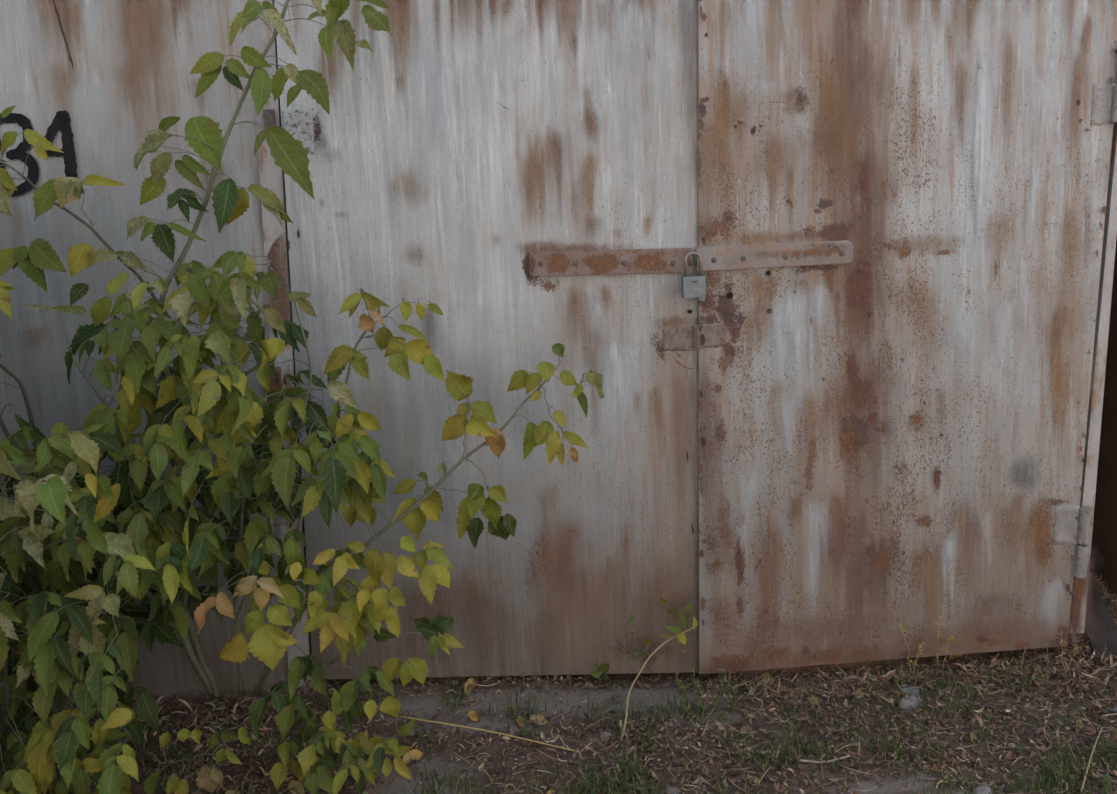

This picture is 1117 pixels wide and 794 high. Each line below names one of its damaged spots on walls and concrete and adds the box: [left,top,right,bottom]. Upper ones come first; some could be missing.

corrosion [1069,0,1103,51]
corrosion [582,156,597,232]
corrosion [522,232,669,293]
corrosion [697,210,739,242]
corrosion [748,198,873,314]
corrosion [884,237,954,261]
corrosion [700,272,738,329]
corrosion [1048,306,1074,431]
corrosion [1006,496,1066,567]
corrosion [1070,559,1092,645]